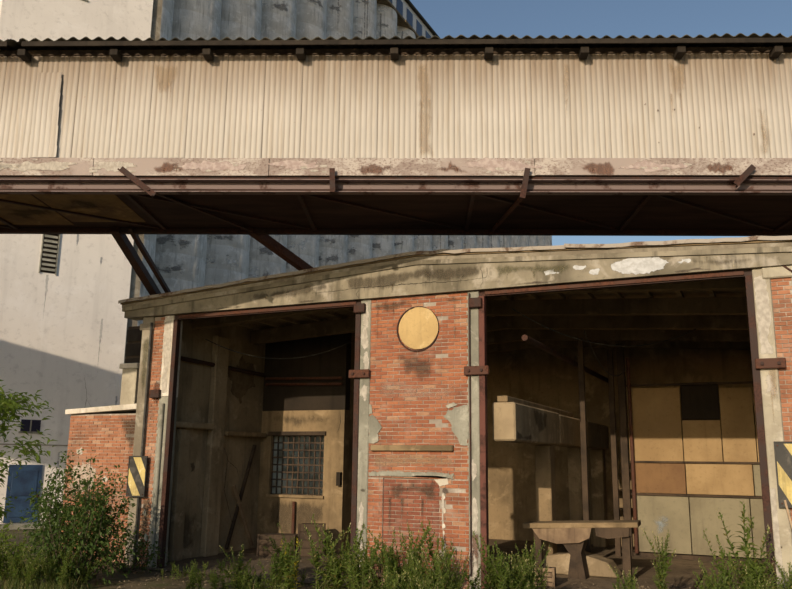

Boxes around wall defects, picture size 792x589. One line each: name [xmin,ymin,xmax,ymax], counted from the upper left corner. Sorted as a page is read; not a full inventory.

peeling [0,159,76,172]
peeling [89,161,136,173]
rust [156,163,182,172]
rust [361,165,389,174]
rust [585,163,614,175]
peeling [611,257,700,275]